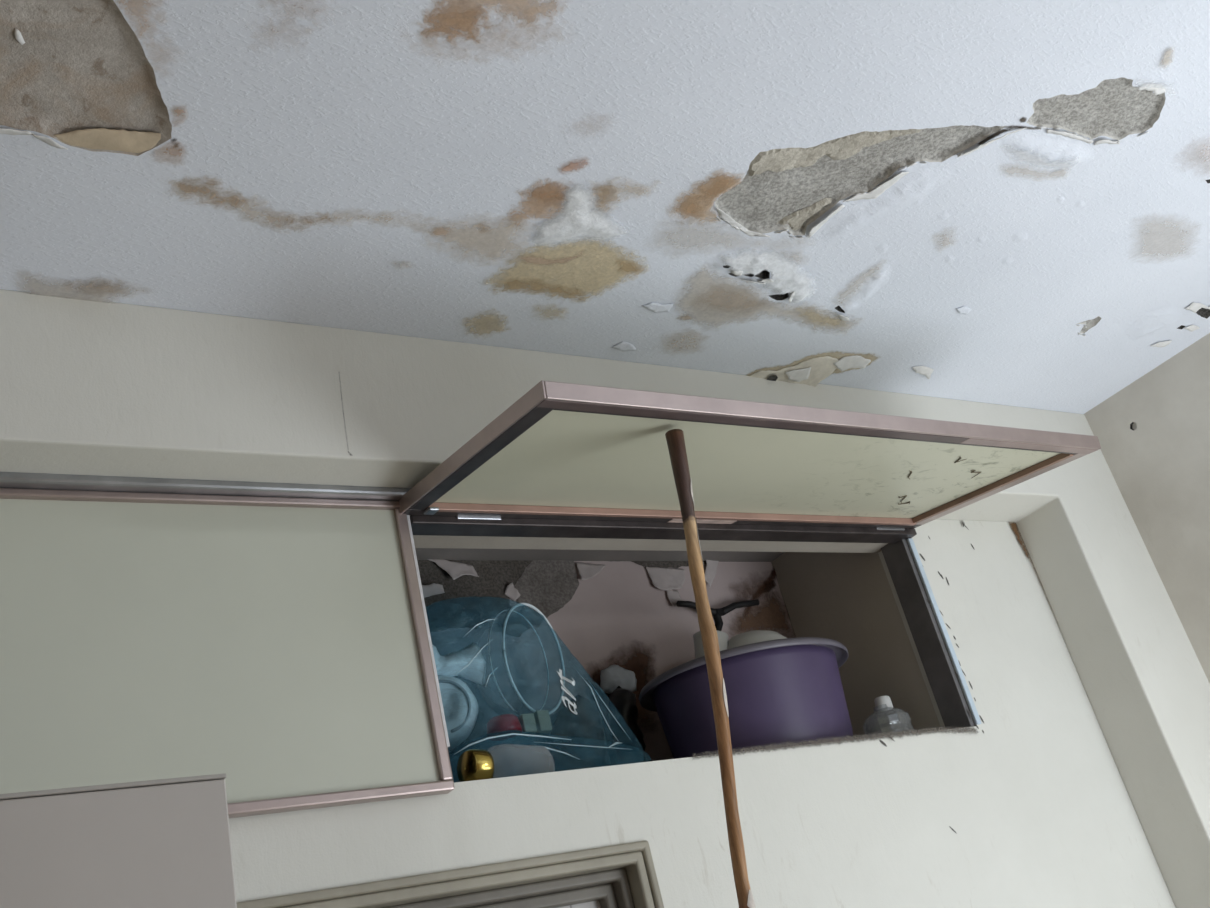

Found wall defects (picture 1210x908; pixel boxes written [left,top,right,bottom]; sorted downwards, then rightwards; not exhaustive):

damp [428,0,557,39]
flaking render [0,0,172,156]
flaking render [714,77,1166,238]
damp [677,175,741,221]
damp [434,183,644,315]
damp [681,271,852,330]
peeling [749,355,871,387]
peeling [631,480,719,607]
peeling [417,559,606,637]